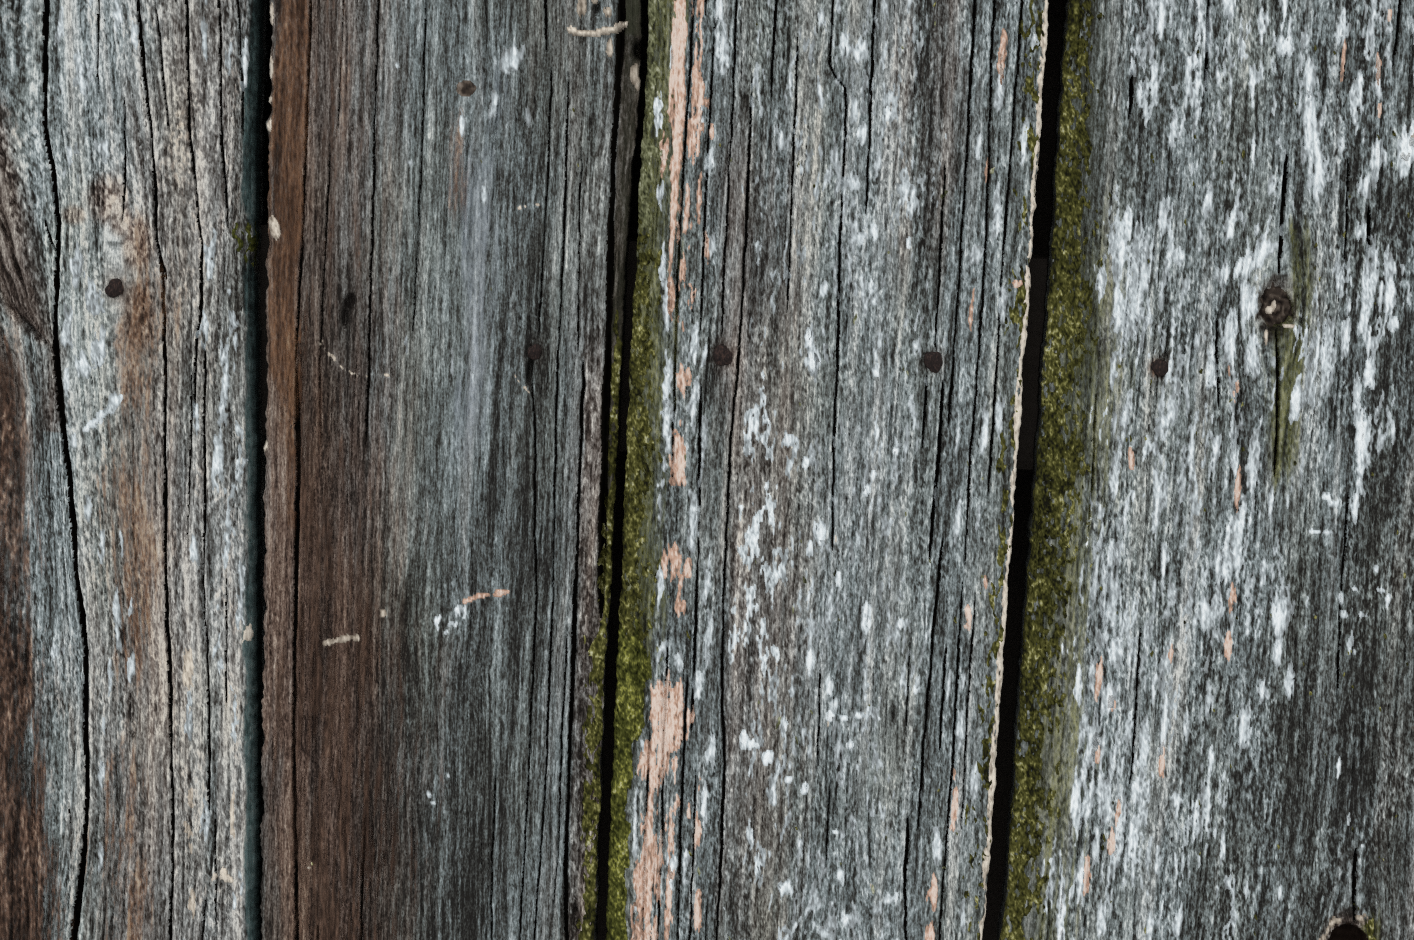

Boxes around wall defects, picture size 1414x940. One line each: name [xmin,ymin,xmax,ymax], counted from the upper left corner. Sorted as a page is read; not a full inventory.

crack [42,0,90,940]
damp [619,0,688,650]
crack [642,0,876,940]
peeling [630,0,941,940]
peeling [915,0,1049,940]
damp [1037,284,1122,936]